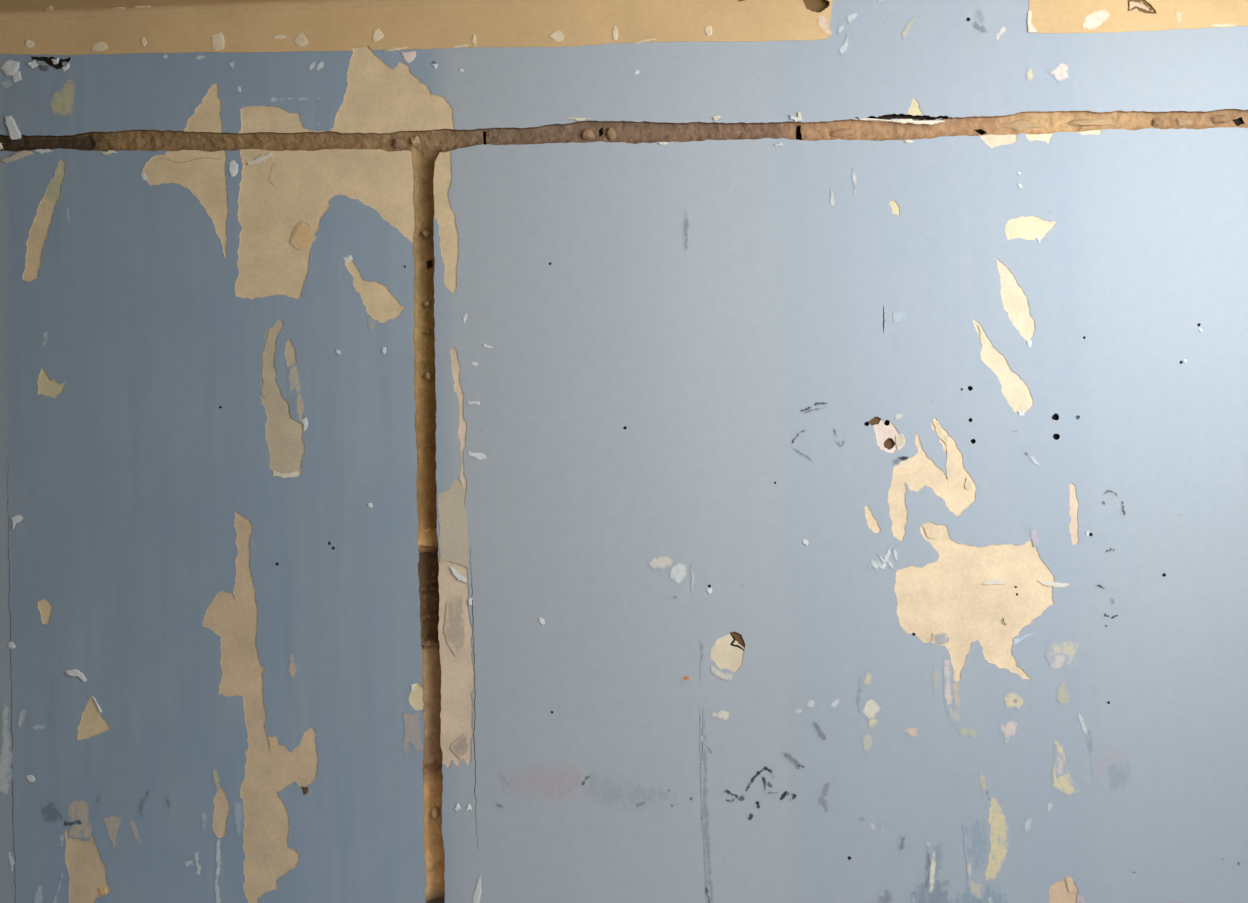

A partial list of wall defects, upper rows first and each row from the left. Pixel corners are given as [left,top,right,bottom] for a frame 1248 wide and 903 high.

peeling [239,28,454,134]
spalling [803,0,832,36]
peeling [141,149,415,300]
peeling [260,320,308,478]
peeling [343,255,406,331]
peeling [433,151,460,293]
peeling [973,318,1034,416]
peeling [995,257,1035,348]
peeling [438,348,478,846]
peeling [864,412,1070,682]
peeling [200,511,319,903]
peeling [33,798,144,903]